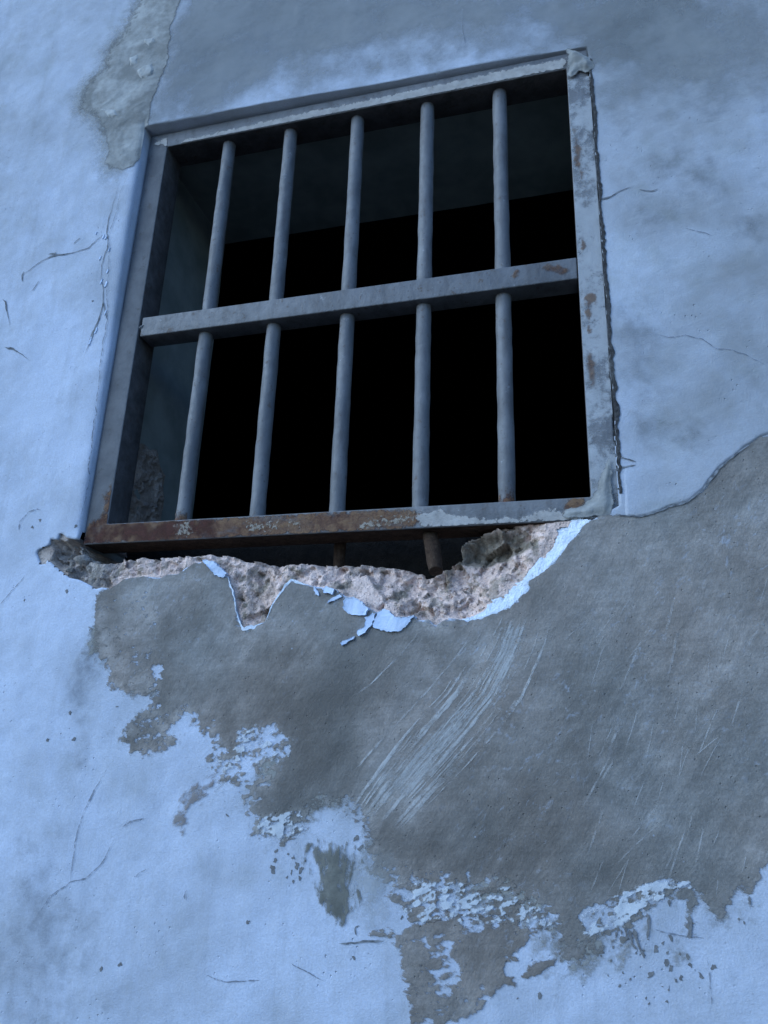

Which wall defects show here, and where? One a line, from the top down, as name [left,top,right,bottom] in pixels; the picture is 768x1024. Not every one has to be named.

crack [22,192,117,350]
rust [584,293,596,332]
rust [84,486,545,554]
peeling [38,436,768,974]
crack [40,771,110,911]